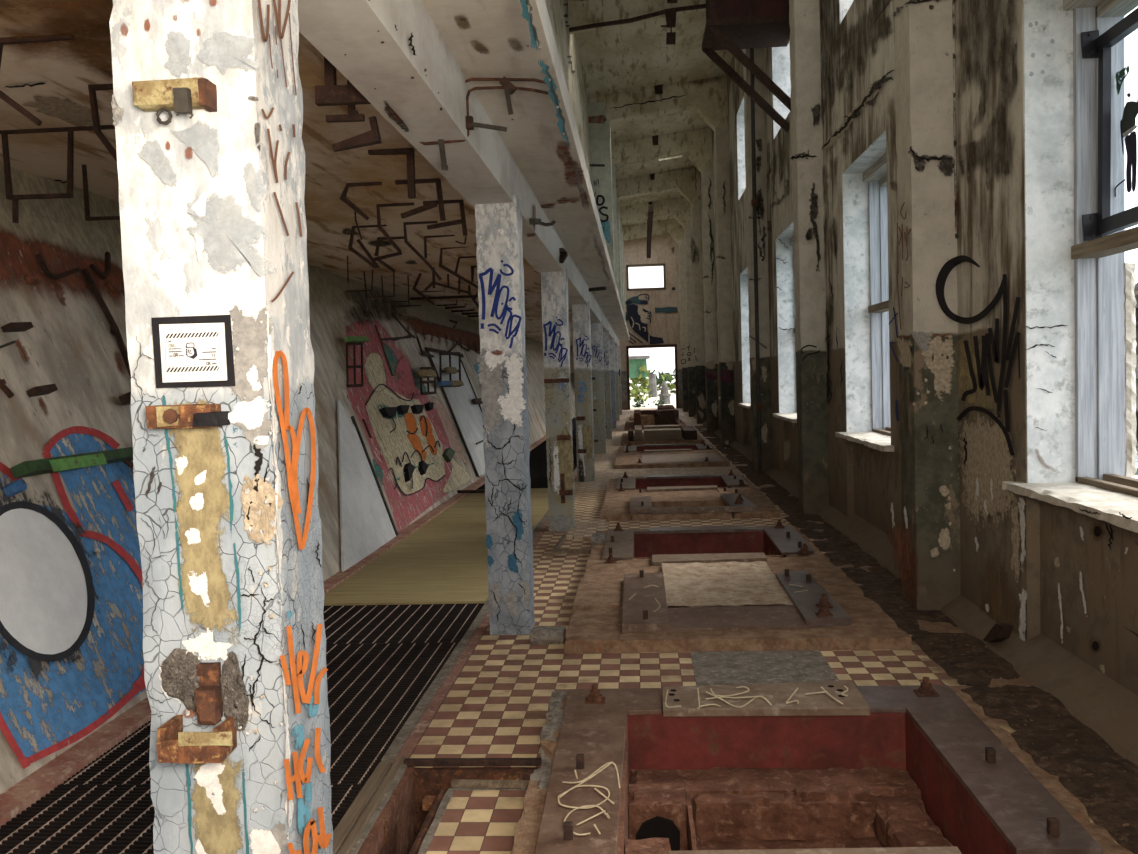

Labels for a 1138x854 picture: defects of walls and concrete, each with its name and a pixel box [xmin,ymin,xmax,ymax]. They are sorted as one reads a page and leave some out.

peeling [162,161,275,277]
leakage [805,138,845,271]
crack [791,70,895,160]
leakage [811,0,891,127]
crack [908,147,955,176]
leakage [952,0,1017,216]
crack [129,336,159,447]
peeling [477,347,526,434]
peeling [175,455,207,511]
peeling [930,411,1027,641]
peeling [188,570,210,607]
crack [241,566,274,752]